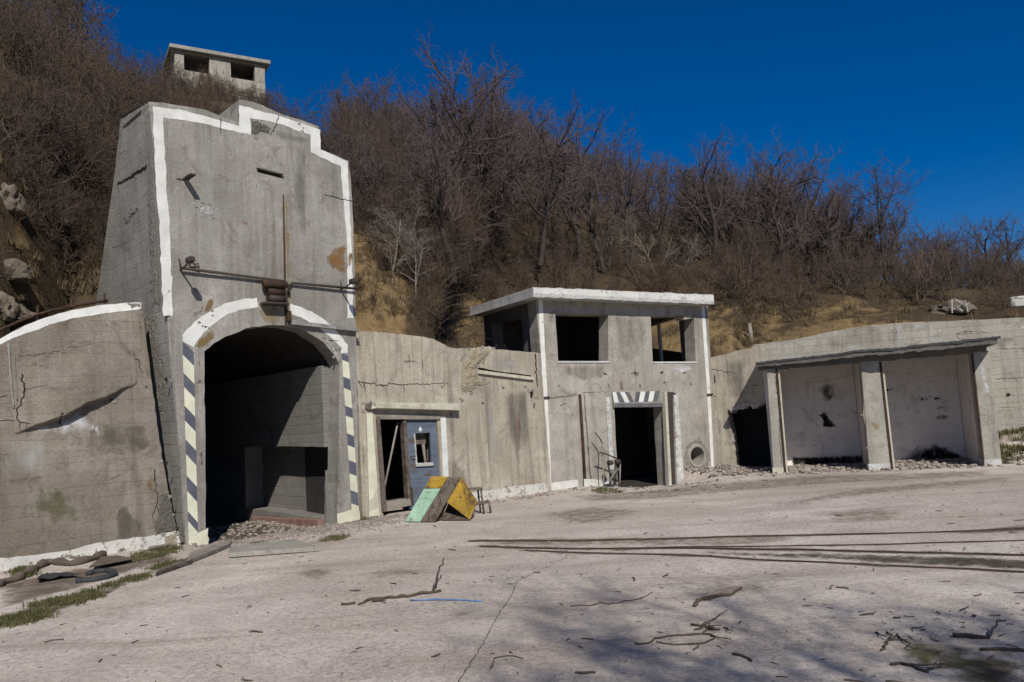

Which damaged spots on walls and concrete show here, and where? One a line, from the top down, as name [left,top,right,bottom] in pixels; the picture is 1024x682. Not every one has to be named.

corrosion [329,247,352,271]
crack [0,344,89,435]
spalling [459,346,495,404]